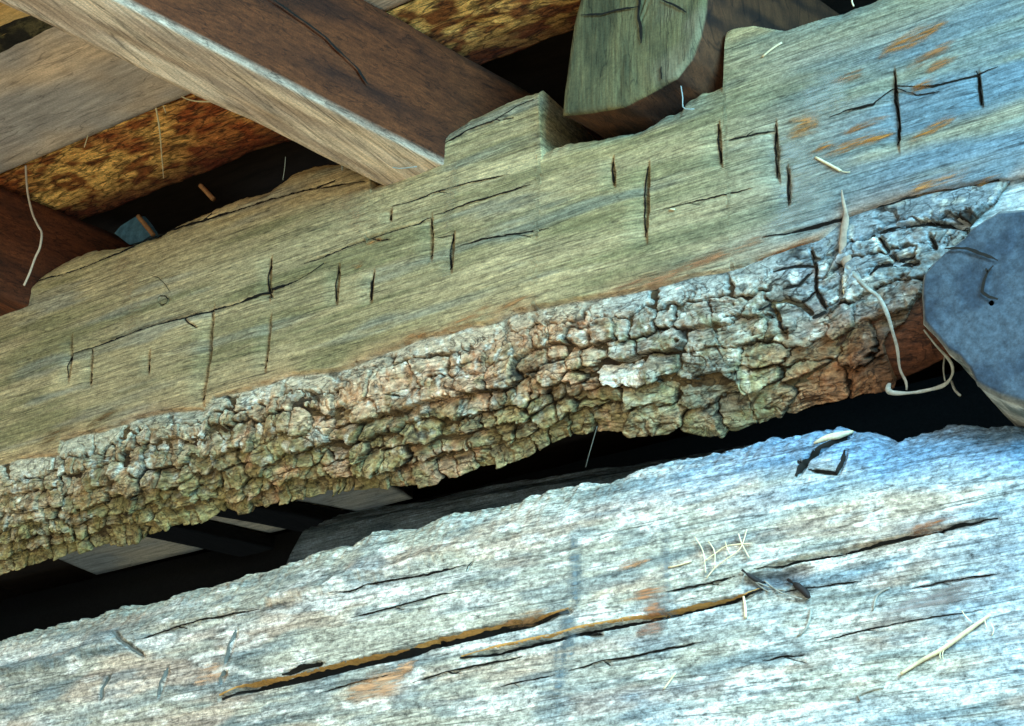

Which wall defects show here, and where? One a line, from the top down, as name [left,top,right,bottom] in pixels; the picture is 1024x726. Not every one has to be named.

crack [830,66,998,117]
crack [37,174,549,353]
crack [219,518,998,700]